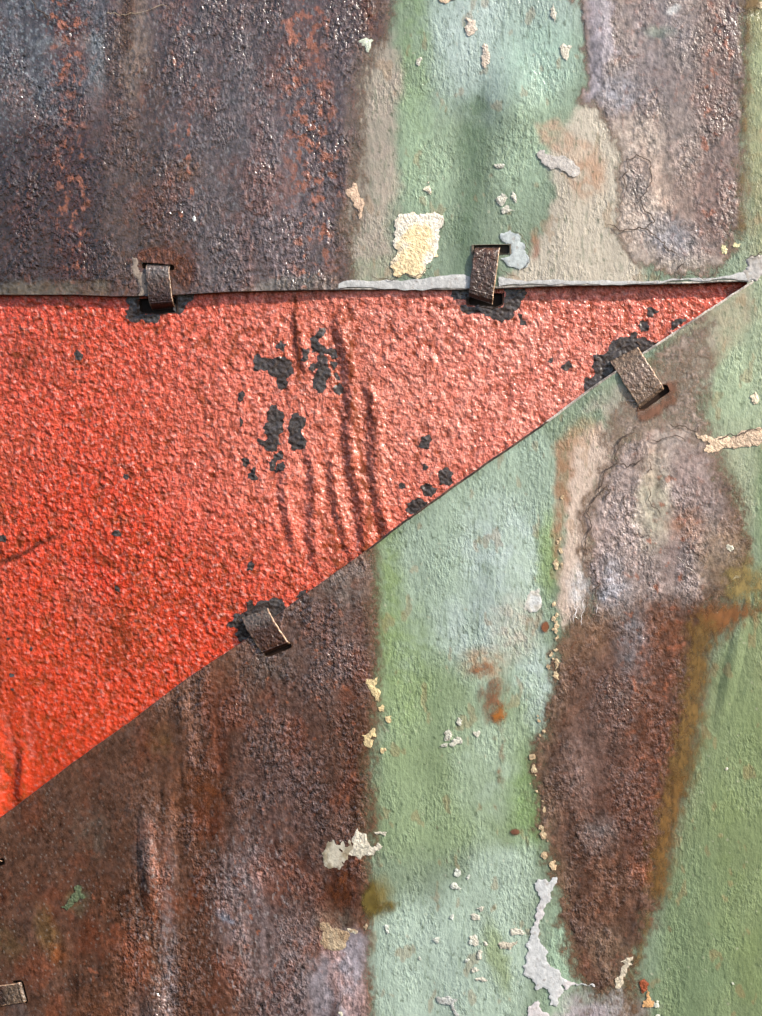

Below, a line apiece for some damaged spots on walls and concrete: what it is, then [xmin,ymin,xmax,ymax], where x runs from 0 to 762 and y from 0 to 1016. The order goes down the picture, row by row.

corrosion [0,0,396,381]
peeling [338,211,762,326]
crack [608,154,719,282]
peeling [257,405,307,473]
peeling [253,327,344,396]
corrosion [347,333,377,488]
crack [585,424,762,603]
peeling [696,427,762,453]
corrosion [529,314,762,1016]
corrosion [0,500,382,1016]
peeling [322,828,387,870]
peeling [465,825,595,1016]